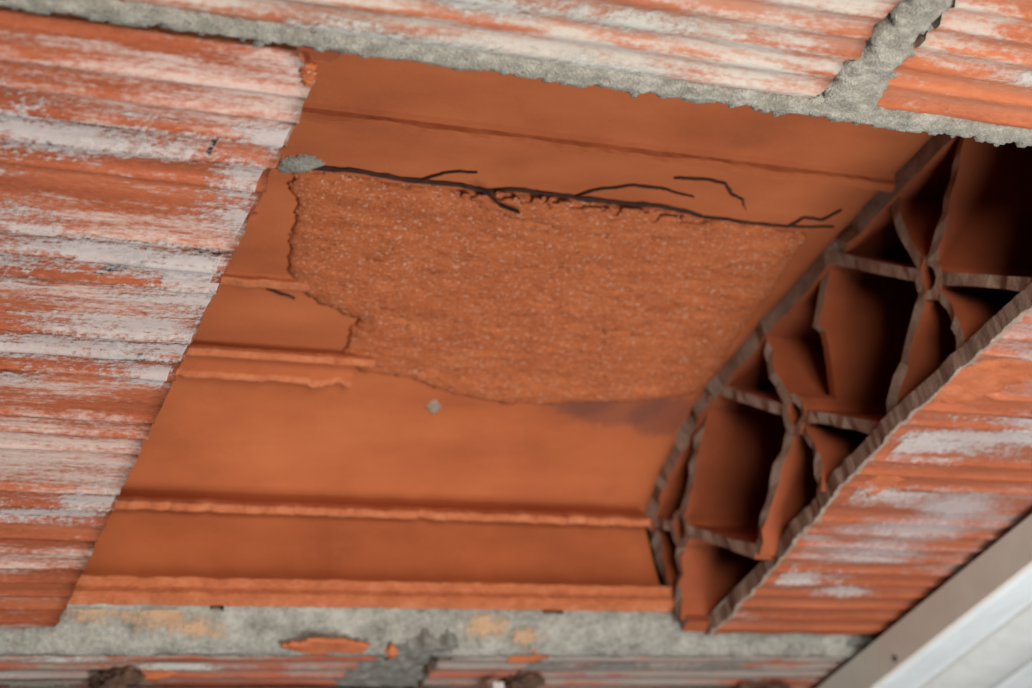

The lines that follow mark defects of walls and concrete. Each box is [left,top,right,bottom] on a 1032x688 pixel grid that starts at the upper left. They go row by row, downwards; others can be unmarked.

peeling [298,61,317,87]
crack [312,166,842,228]
spalling [276,154,808,414]
peeling [935,358,1032,404]
peeling [861,475,905,497]
spalling [0,575,882,682]